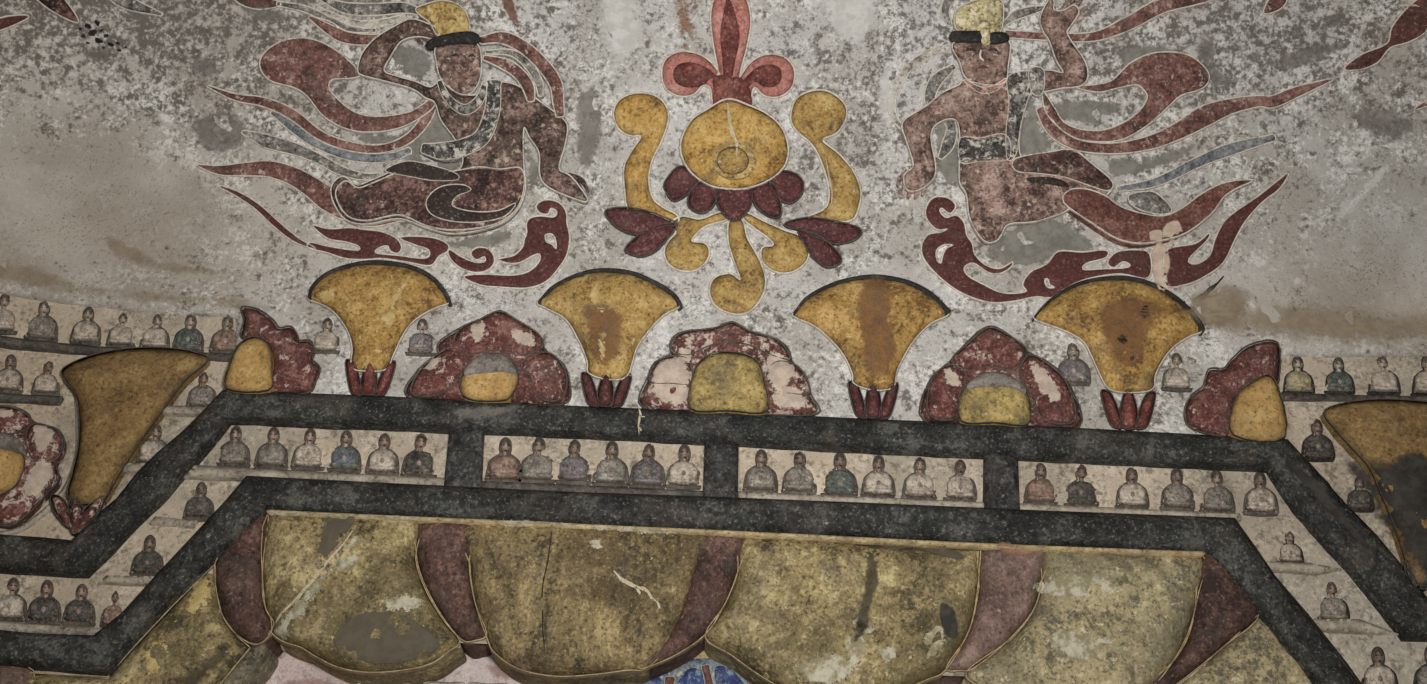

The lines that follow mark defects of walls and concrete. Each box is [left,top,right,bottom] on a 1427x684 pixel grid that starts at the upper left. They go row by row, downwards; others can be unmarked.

leakage [1189,288,1427,337]
peeling [651,347,691,406]
peeling [765,351,805,410]
peeling [944,368,962,387]
peeling [1029,361,1061,402]
crack [613,570,661,609]